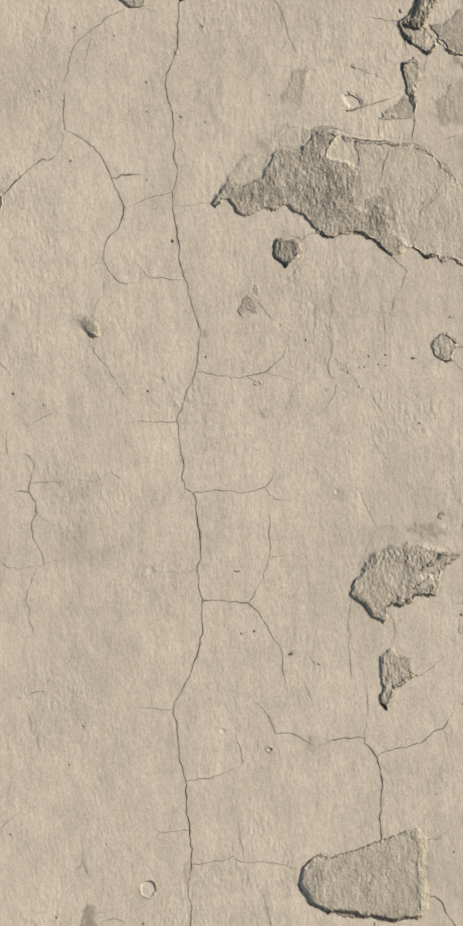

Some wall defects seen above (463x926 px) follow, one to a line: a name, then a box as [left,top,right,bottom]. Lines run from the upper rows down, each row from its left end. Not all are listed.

peeling [378,0,463,134]
spalling [208,61,463,275]
crack [338,95,463,188]
crack [317,287,385,415]
crack [384,257,407,354]
spalling [429,331,460,364]
crack [0,0,317,926]
spalling [347,509,463,626]
crack [257,599,454,839]
spalling [377,645,425,711]
spalling [296,824,437,924]
crack [430,895,456,926]